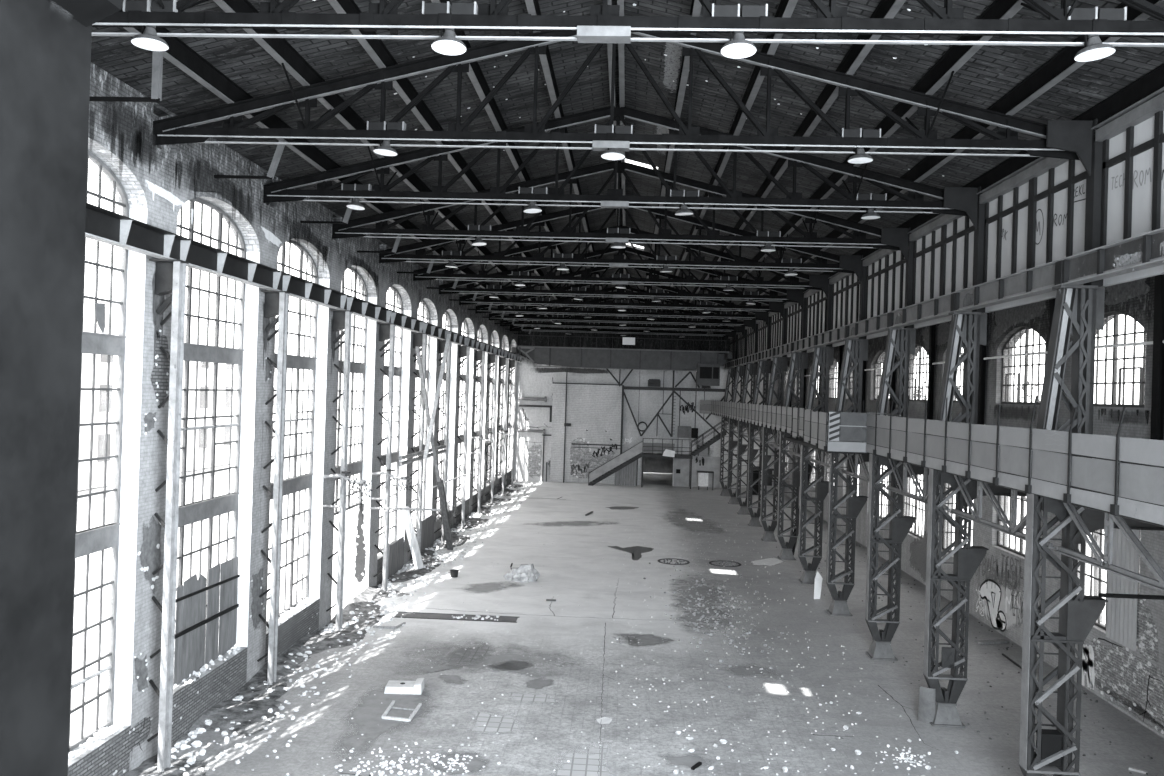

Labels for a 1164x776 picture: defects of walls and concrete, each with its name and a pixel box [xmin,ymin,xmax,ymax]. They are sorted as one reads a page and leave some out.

water stain [90,102,328,274]
spalling [1083,599,1164,734]